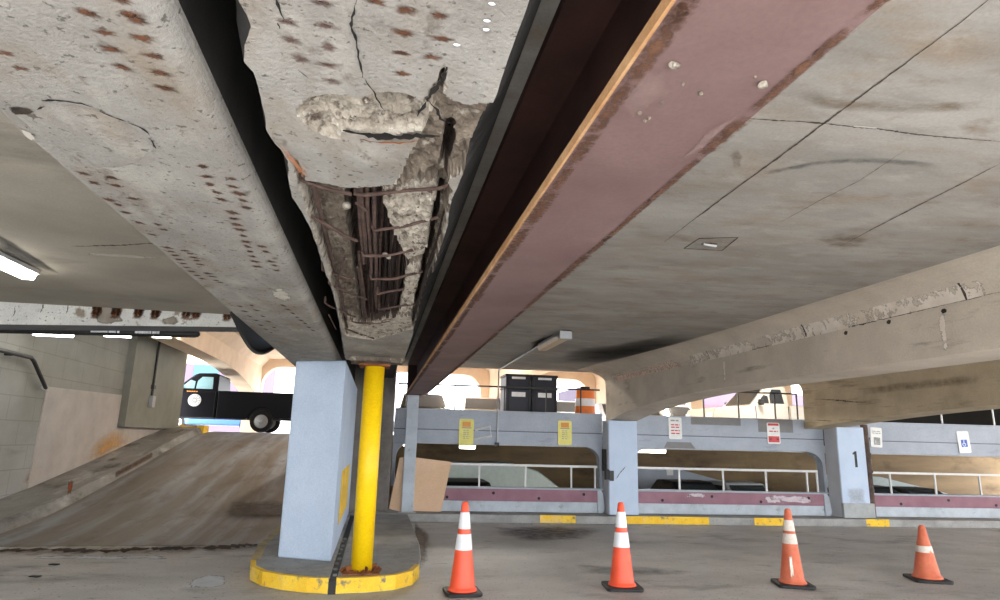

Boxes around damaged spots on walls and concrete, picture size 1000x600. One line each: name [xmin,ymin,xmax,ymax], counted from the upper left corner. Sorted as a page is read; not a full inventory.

corrosion [96,30,121,52]
corrosion [116,0,151,42]
corrosion [143,53,174,91]
crack [343,0,452,144]
corrosion [753,30,847,109]
crack [37,99,156,148]
crack [750,118,1000,142]
corrosion [103,197,167,236]
corrosion [198,164,279,271]
spalling [294,67,487,340]
corrosion [91,307,161,319]
peeling [690,280,985,364]